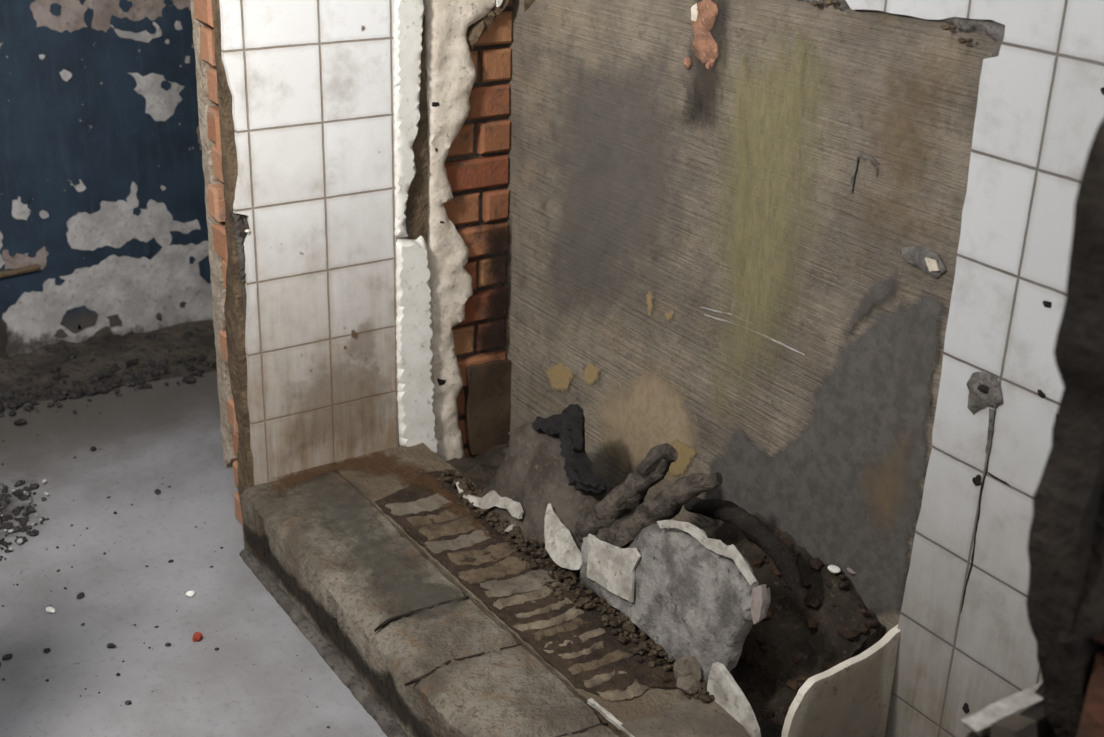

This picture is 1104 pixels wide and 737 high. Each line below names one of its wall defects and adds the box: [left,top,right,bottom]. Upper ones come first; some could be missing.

peeling [29,0,191,44]
spalling [684,0,719,69]
spalling [808,0,857,12]
spalling [941,17,1005,57]
leakage [685,0,727,123]
peeling [128,73,184,121]
peeling [68,176,86,192]
spalling [423,0,503,462]
peeling [0,182,213,357]
crack [374,596,469,632]
flaking render [1076,633,1104,737]
crack [554,723,608,737]